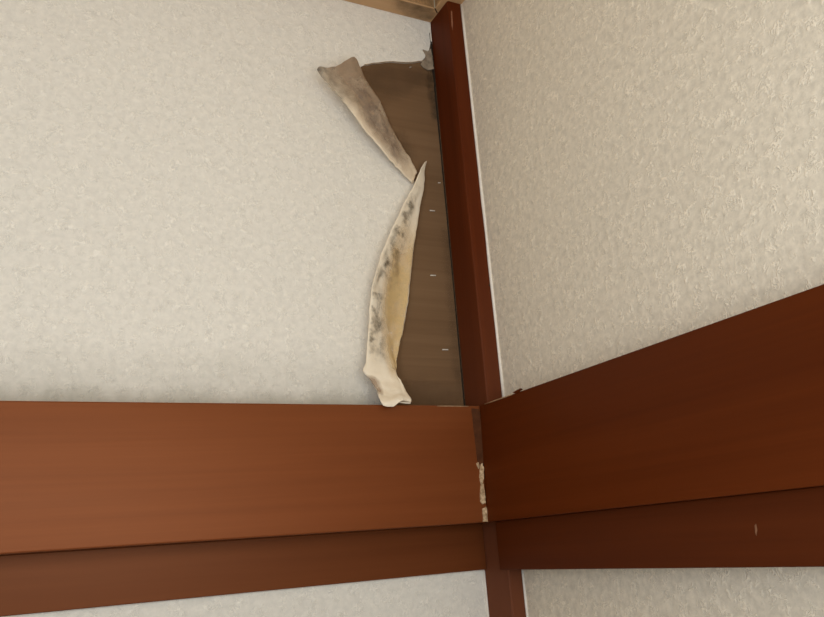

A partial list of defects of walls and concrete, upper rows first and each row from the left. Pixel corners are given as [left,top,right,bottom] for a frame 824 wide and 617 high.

damp [376,250,412,369]